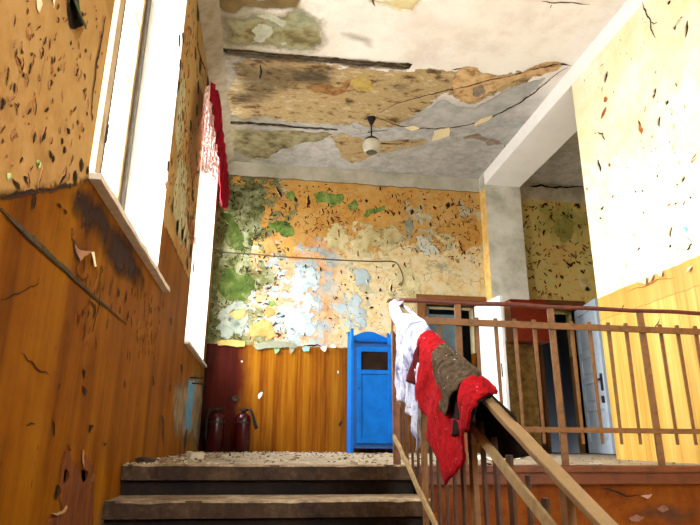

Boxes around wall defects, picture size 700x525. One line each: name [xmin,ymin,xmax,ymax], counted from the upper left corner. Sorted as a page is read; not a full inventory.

peeling [1,0,106,197]
flaking render [227,59,562,163]
crack [230,63,571,145]
peeling [6,154,43,210]
crack [531,182,582,190]
crack [2,283,39,300]
water stain [73,189,144,286]
peeling [207,180,481,354]
peeling [523,195,614,300]
peeling [46,444,94,525]